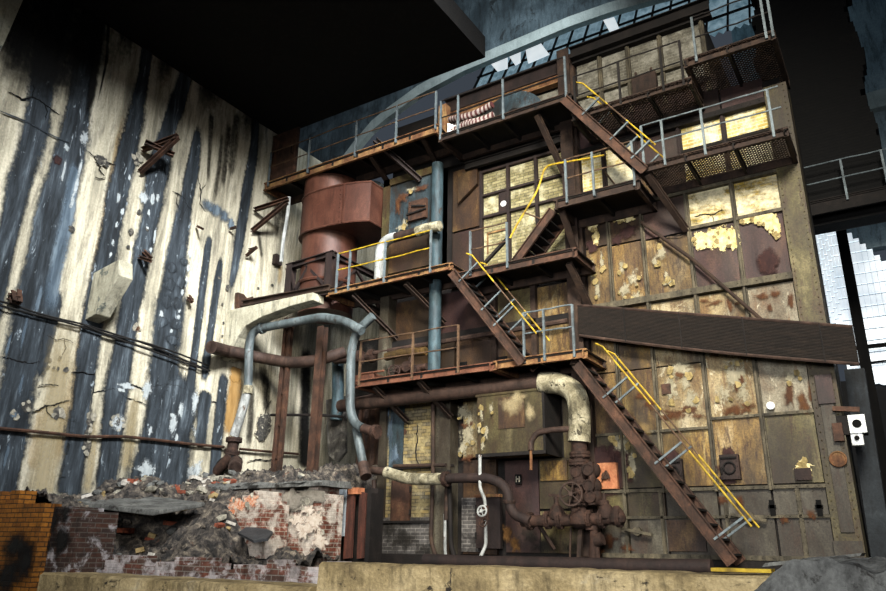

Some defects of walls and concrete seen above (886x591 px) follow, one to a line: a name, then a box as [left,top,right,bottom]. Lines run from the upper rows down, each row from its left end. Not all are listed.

crack [8,86,60,120]
water stain [0,0,259,495]
peeling [652,243,675,286]
peeling [691,209,781,251]
crack [2,356,39,364]
crack [33,335,189,418]
water stain [247,367,269,442]
peeling [457,402,493,457]
rust [662,406,702,420]
rust [722,403,755,415]
rust [784,384,812,410]
spalling [226,487,329,559]